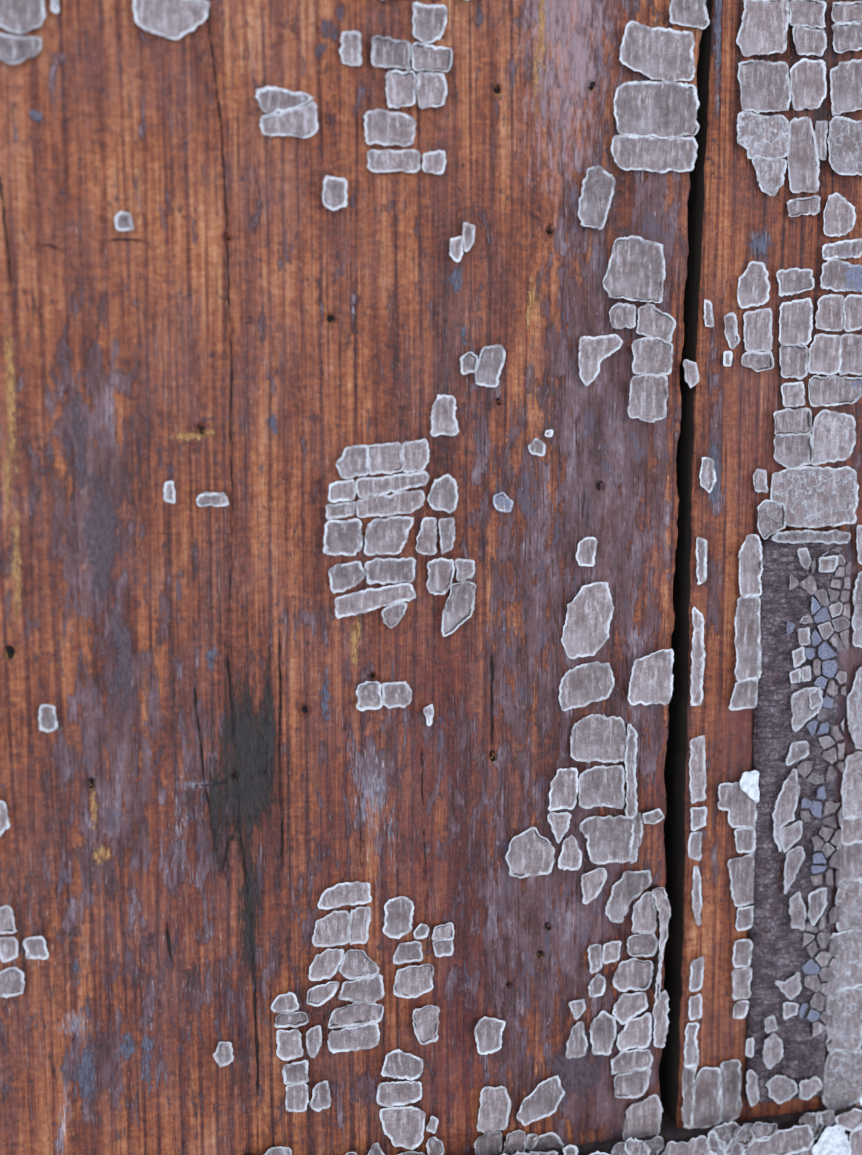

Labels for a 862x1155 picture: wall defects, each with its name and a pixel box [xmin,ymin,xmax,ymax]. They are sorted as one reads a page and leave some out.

peeling [0,0,60,64]
peeling [255,86,318,138]
peeling [339,1,453,174]
peeling [322,175,348,211]
peeling [449,222,476,262]
peeling [460,344,506,387]
peeling [323,394,476,637]
peeling [474,0,862,1155]
peeling [356,681,412,711]
peeling [423,704,434,727]
leakage [209,645,279,979]
peeling [271,881,455,1155]